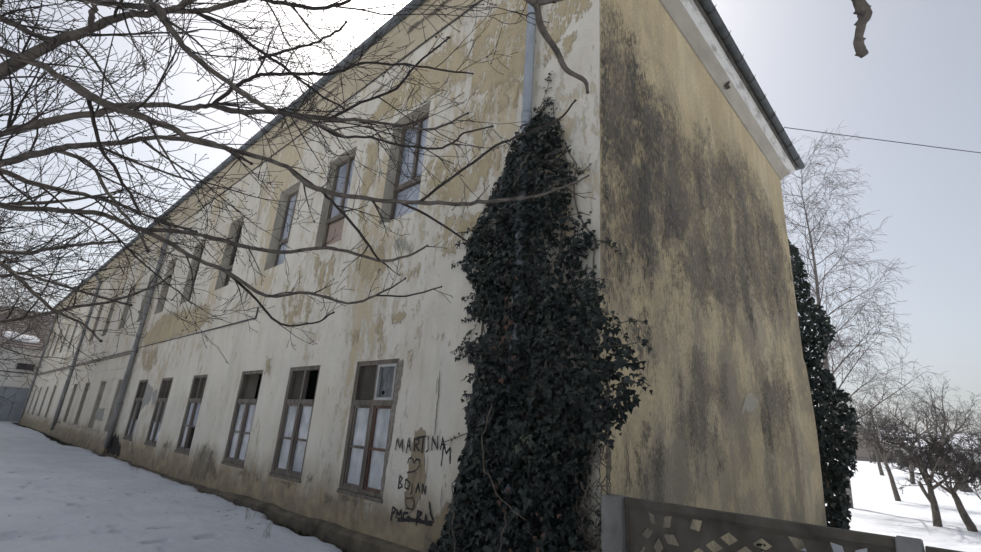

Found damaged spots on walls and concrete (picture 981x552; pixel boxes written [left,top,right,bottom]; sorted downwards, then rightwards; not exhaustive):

peeling [366,0,592,259]
peeling [356,139,385,283]
damp [599,4,798,382]
damp [104,433,121,457]
peeling [140,304,210,410]
peeling [281,254,336,332]
peeling [374,305,414,357]
damp [675,346,731,492]
damp [755,355,800,471]